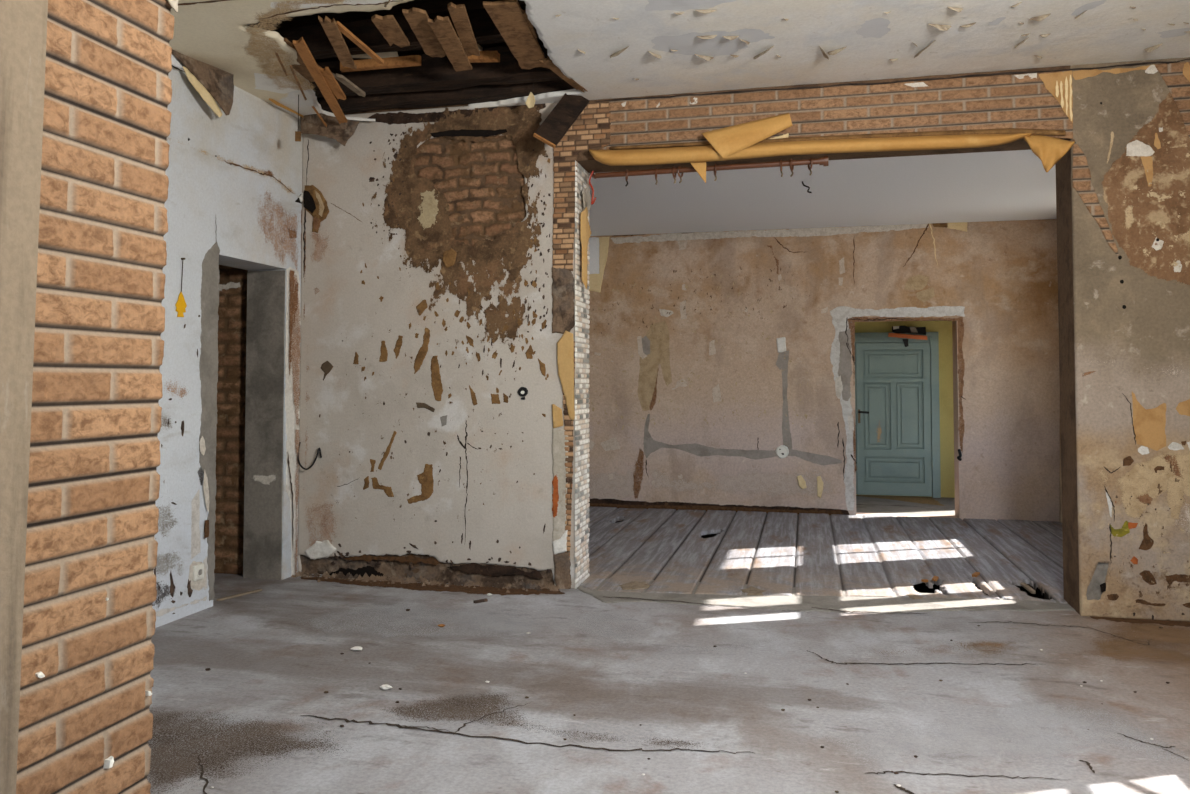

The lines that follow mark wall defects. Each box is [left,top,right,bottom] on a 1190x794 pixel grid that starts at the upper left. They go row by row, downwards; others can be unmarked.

peeling [648,28,781,61]
peeling [1101,92,1190,285]
flaking render [321,103,552,522]
flaking render [285,267,555,586]
flaking render [845,317,966,453]
peeling [1086,441,1190,620]
water stain [152,551,185,609]
crack [198,754,209,794]
water stain [147,706,349,794]
crack [300,703,754,754]
water stain [382,691,727,751]
crack [1118,733,1189,761]